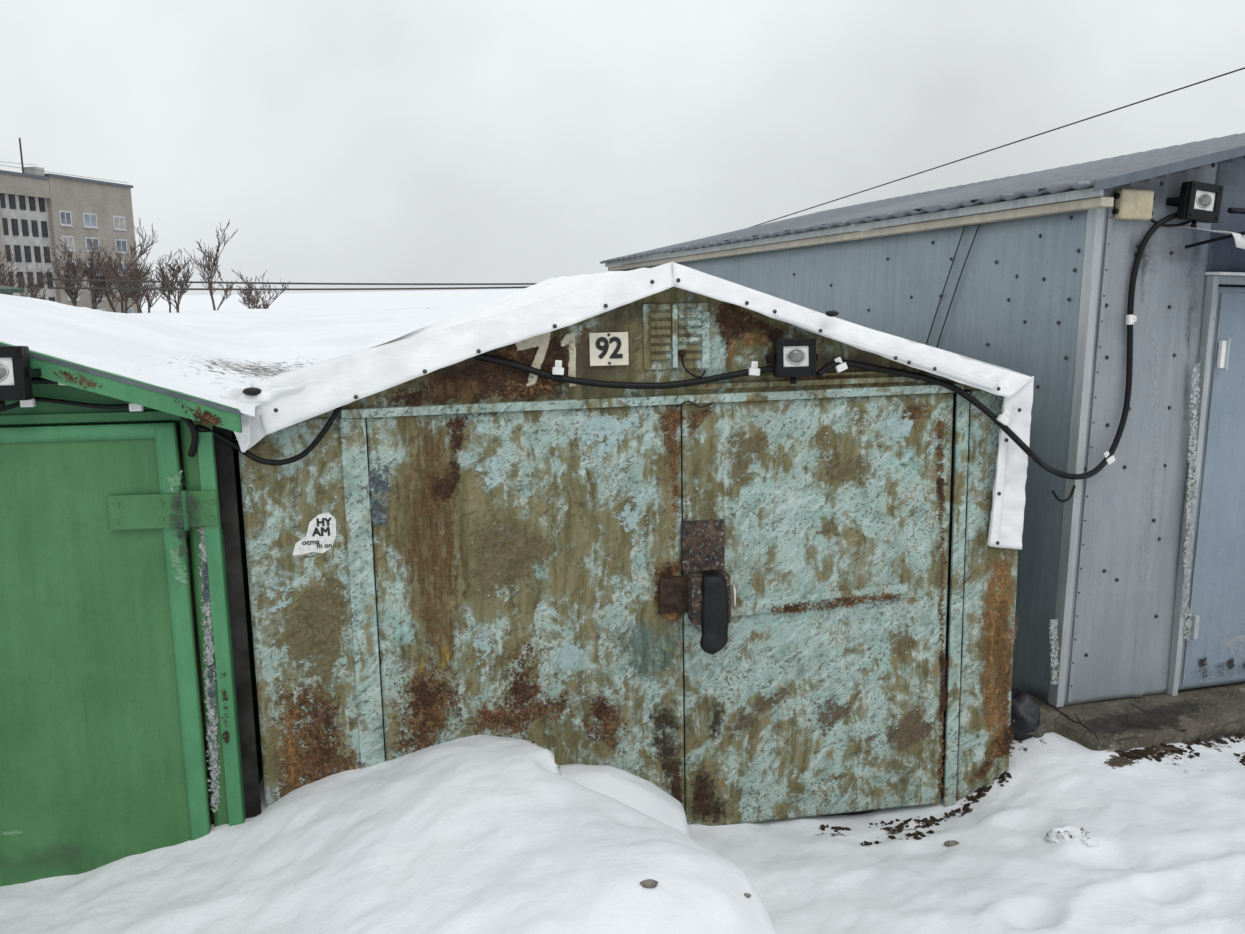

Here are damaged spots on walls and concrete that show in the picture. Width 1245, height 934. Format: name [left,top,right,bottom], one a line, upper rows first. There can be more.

corrosion [713,302,785,367]
peeling [578,411,641,470]
peeling [852,409,914,445]
peeling [368,465,392,528]
corrosion [366,329,632,761]
peeling [614,485,649,546]
corrosion [770,592,901,614]
corrosion [901,404,948,797]
corrosion [969,552,1019,783]
corrosion [260,671,360,804]
peeling [723,682,797,738]
peeling [808,694,860,742]